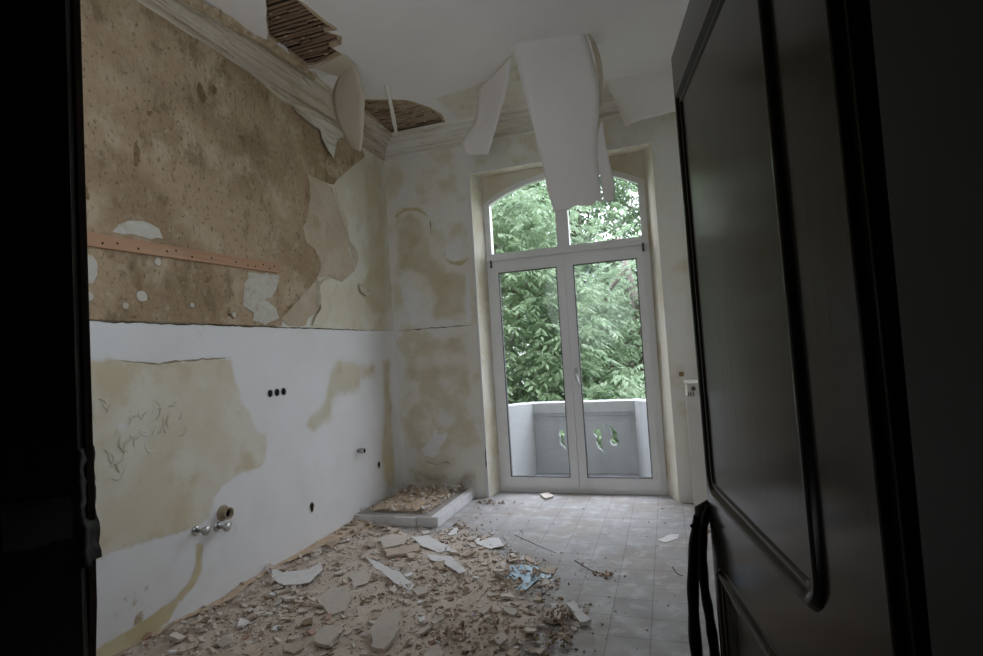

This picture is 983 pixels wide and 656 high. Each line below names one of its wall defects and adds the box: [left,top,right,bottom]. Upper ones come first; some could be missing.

flaking render [80,0,365,326]
flaking render [437,51,527,119]
water stain [307,160,499,490]
water stain [91,356,268,561]
water stain [96,542,204,656]